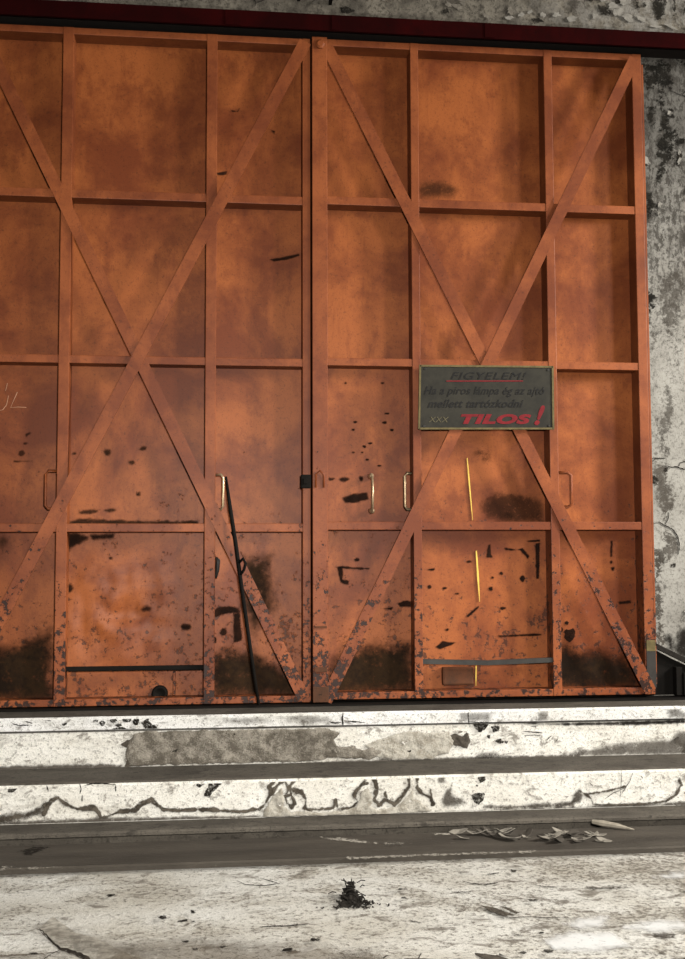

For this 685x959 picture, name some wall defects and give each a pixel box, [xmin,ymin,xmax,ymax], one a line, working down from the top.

peeling [504,6,577,24]
peeling [589,0,677,30]
rust [69,509,198,549]
rust [338,558,369,585]
rust [505,540,540,582]
rust [215,606,242,643]
spalling [93,719,508,767]
crack [79,783,116,801]
crack [0,916,142,959]